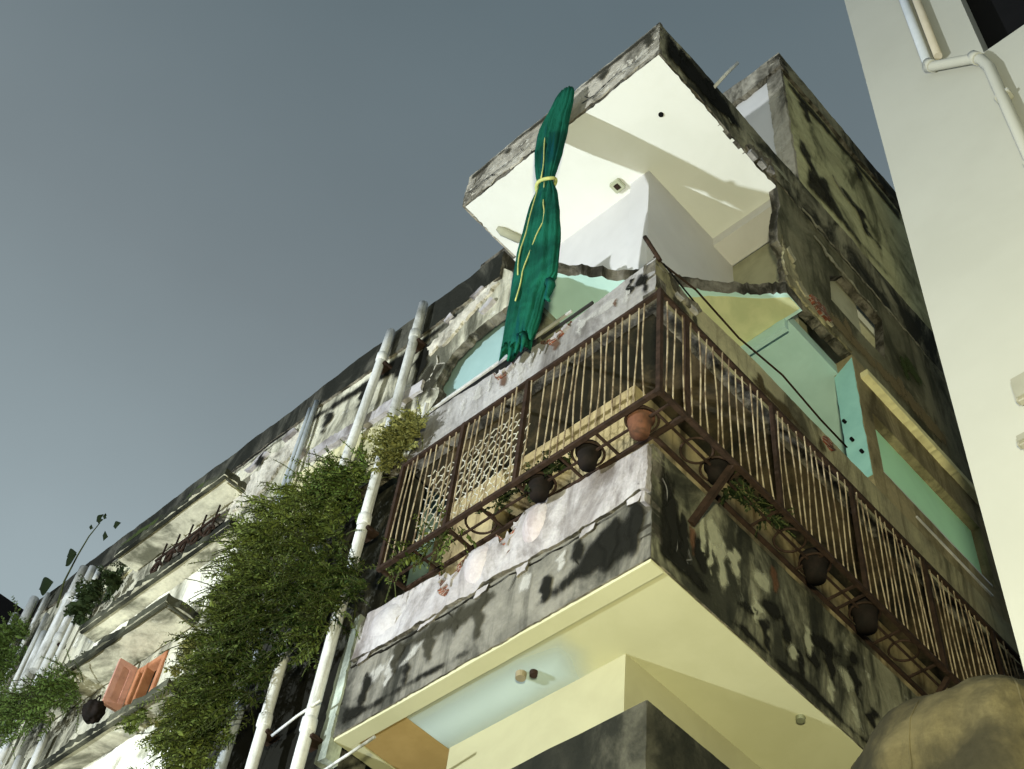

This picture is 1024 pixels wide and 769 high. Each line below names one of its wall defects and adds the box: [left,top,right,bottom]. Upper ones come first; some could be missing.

leakage [574,28,654,93]
leakage [668,37,740,127]
leakage [471,114,547,179]
mould [800,141,881,253]
mould [788,82,900,219]
peeling [427,282,500,356]
spalling [494,362,515,380]
flaking render [350,443,668,666]
leakage [520,503,643,601]
leakage [660,468,740,592]
leakage [342,591,493,723]
leakage [735,572,880,743]